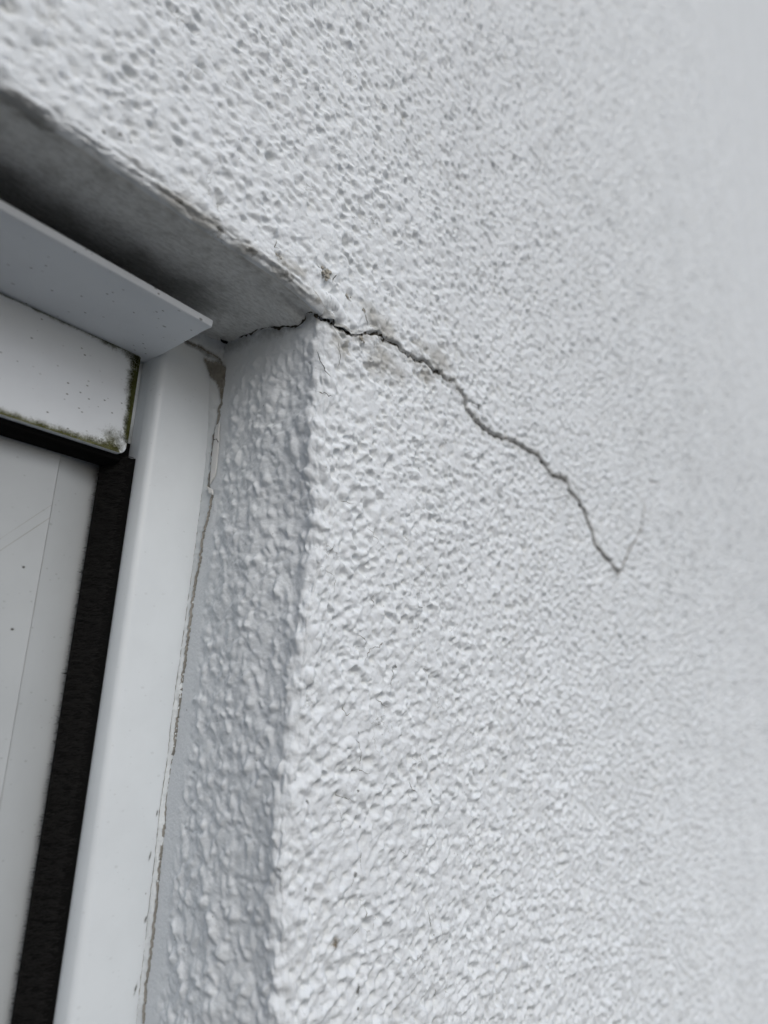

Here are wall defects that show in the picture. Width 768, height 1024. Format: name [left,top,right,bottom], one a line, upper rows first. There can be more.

crack [240,312,658,574]